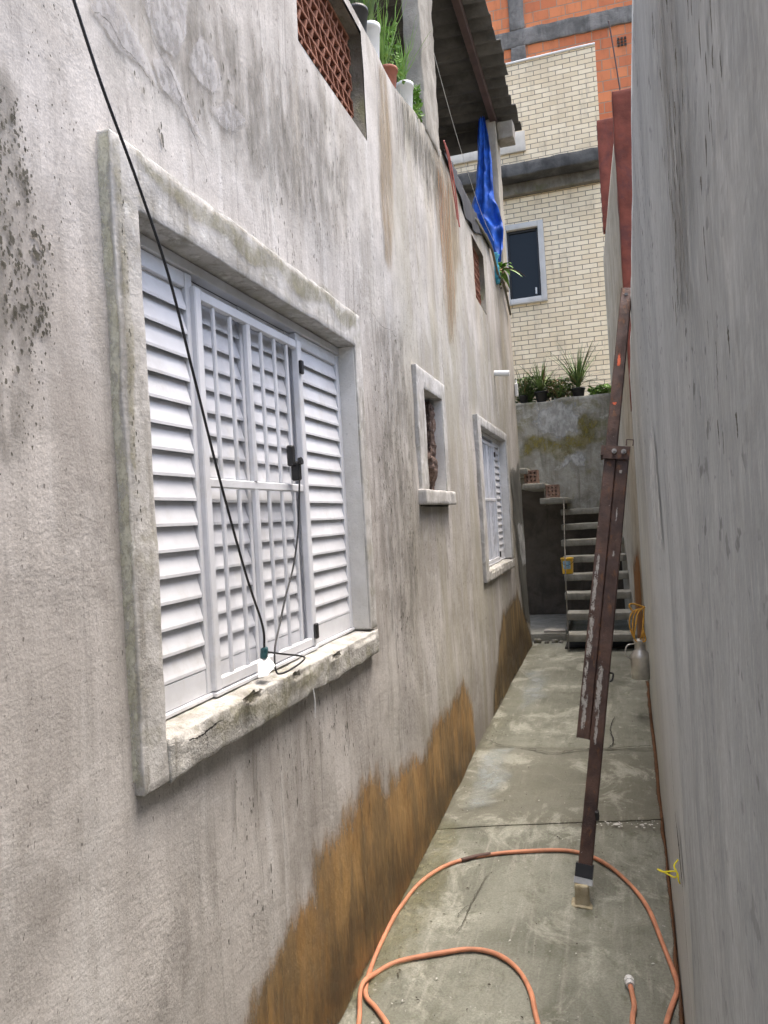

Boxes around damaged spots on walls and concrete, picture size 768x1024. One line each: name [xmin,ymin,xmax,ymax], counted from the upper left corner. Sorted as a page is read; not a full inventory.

water stain [0,87,59,450]
water stain [534,402,588,438]
crack [189,720,223,747]
water stain [249,680,506,1024]